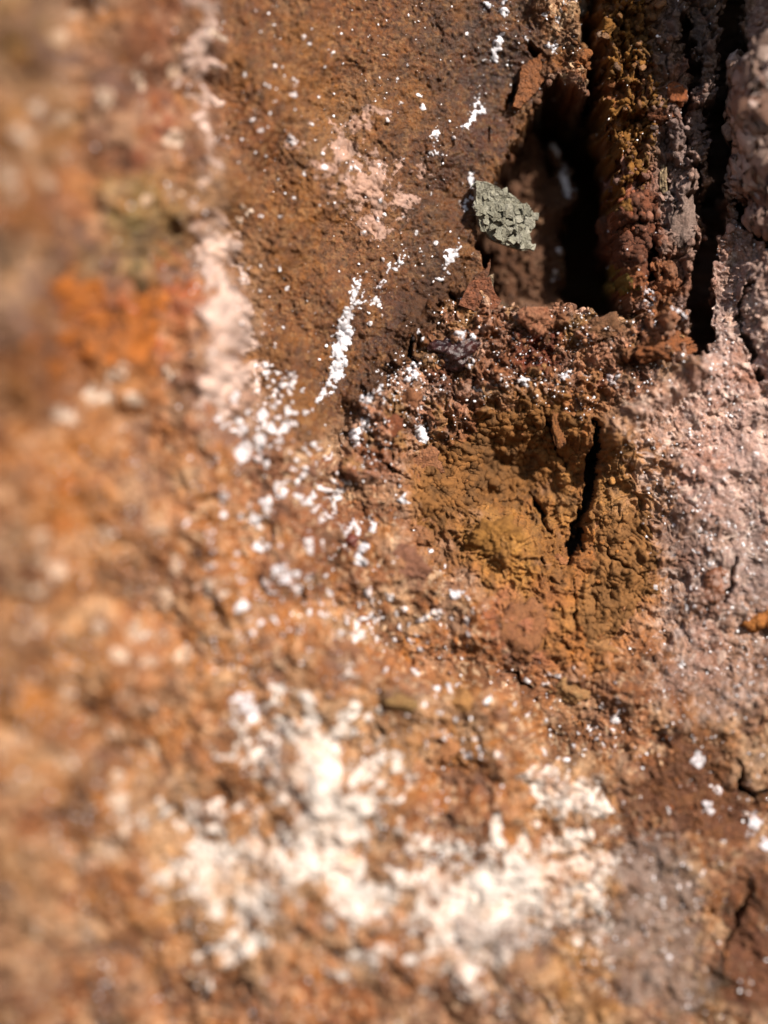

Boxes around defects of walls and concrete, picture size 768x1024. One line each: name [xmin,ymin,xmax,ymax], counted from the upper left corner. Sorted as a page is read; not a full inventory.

crack [505,85,517,109]
efflorescence [235,203,254,226]
efflorescence [192,248,474,652]
crack [532,420,601,565]
efflorescence [15,527,71,642]
efflorescence [154,587,173,612]
efflorescence [169,553,183,575]
efflorescence [108,619,193,668]
efflorescence [54,666,646,1021]
efflorescence [629,854,705,936]